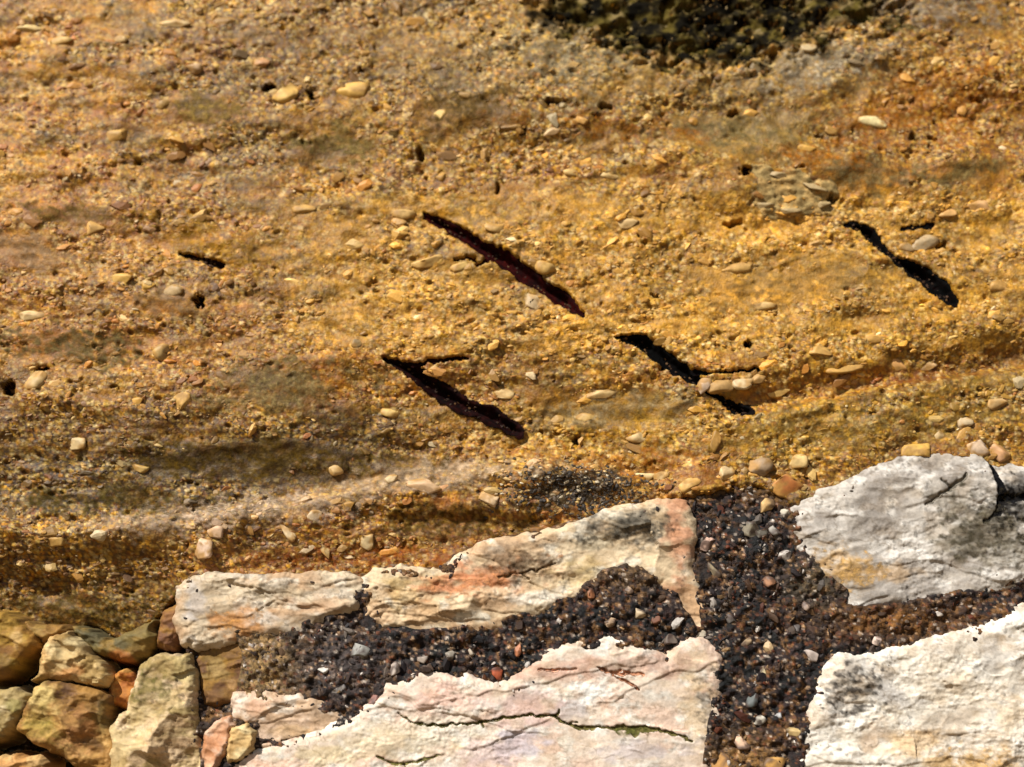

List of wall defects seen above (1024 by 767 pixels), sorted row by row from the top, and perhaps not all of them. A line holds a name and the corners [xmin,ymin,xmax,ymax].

crack [423,213,585,318]
crack [843,221,959,308]
crack [383,356,525,439]
crack [615,334,761,416]